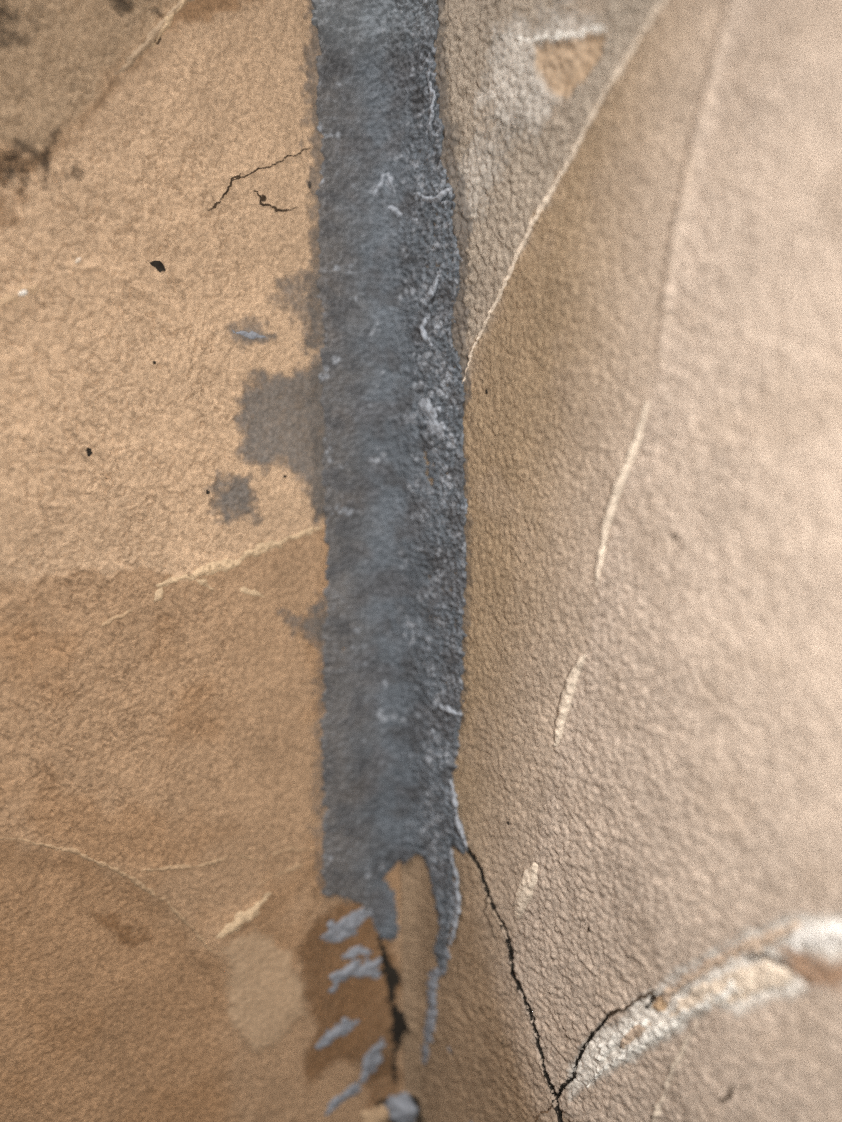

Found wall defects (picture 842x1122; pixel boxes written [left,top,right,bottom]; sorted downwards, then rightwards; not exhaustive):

crack [376,936,424,1122]
crack [463,845,608,1122]
flaking render [568,913,842,1100]